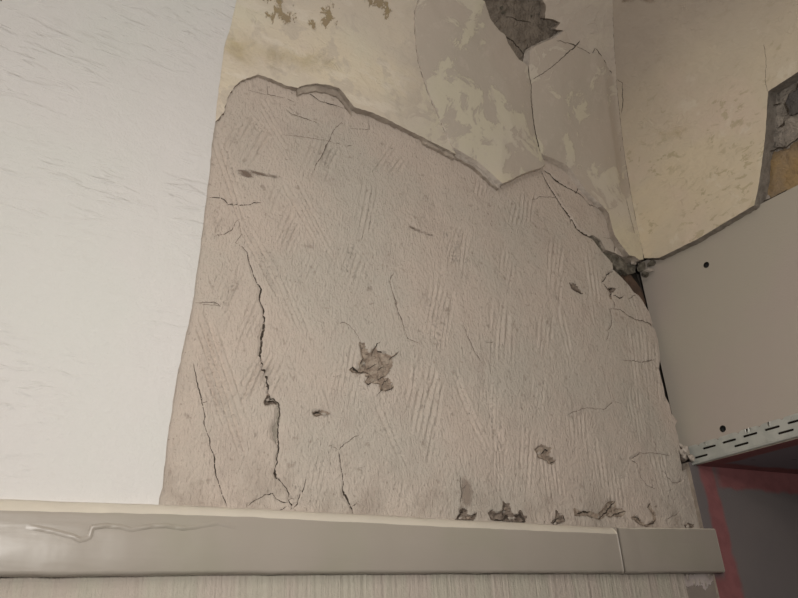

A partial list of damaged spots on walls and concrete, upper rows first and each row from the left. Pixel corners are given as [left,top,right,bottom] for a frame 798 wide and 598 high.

damp [263,0,296,24]
damp [309,7,337,29]
damp [368,0,391,19]
spalling [483,0,558,61]
flaking render [764,81,798,202]
crack [537,171,616,252]
crack [210,195,306,510]
spalling [349,341,398,394]
crack [193,363,226,503]
crack [331,435,359,513]
spalling [488,501,527,523]
spalling [544,501,656,527]